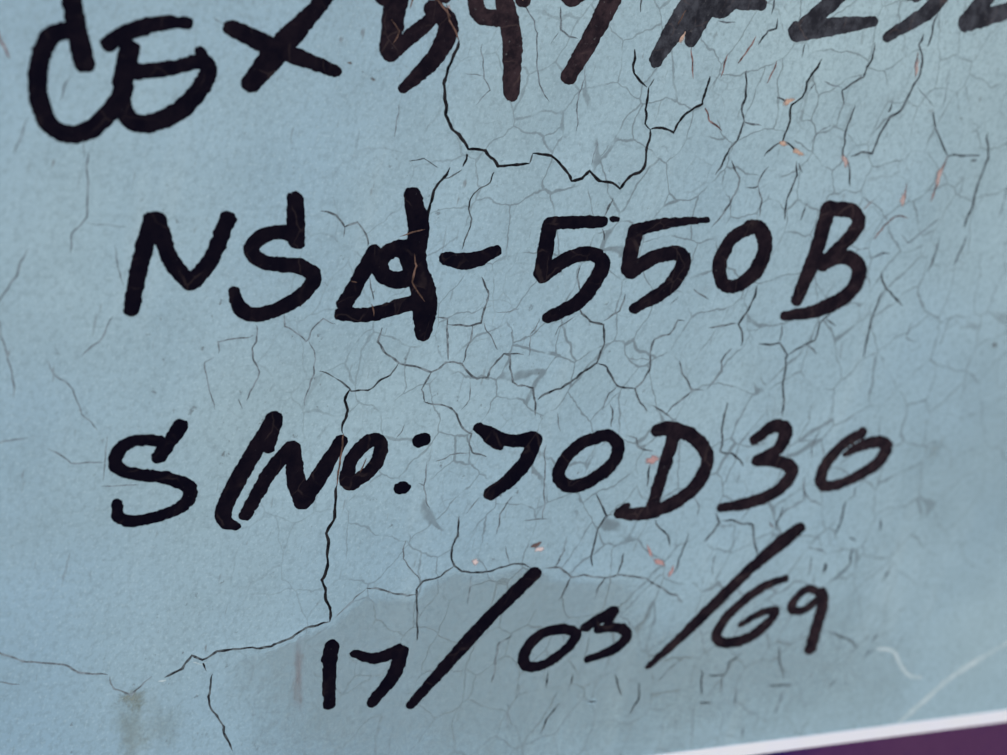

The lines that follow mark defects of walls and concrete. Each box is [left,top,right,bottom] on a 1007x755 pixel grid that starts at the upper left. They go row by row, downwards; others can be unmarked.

crack [70,144,124,286]
crack [322,211,369,245]
crack [402,0,989,357]
crack [0,249,856,751]
crack [828,631,880,658]